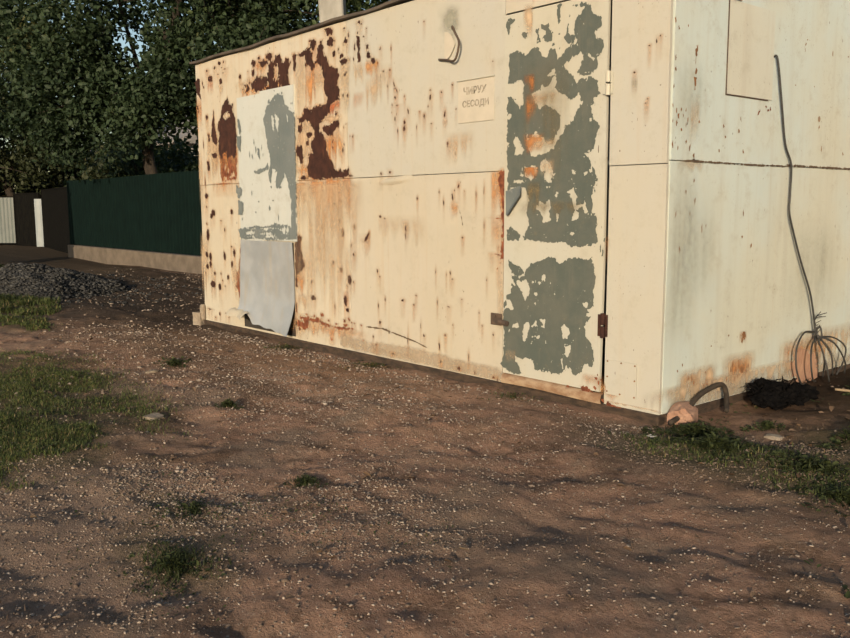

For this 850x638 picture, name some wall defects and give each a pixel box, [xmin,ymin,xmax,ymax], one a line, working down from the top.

rust [195,61,238,186]
rust [202,193,241,298]
peeling [236,90,297,241]
rust [294,235,316,312]
rust [239,20,391,237]
rust [483,170,505,269]
peeling [500,1,605,376]
rust [677,331,847,398]